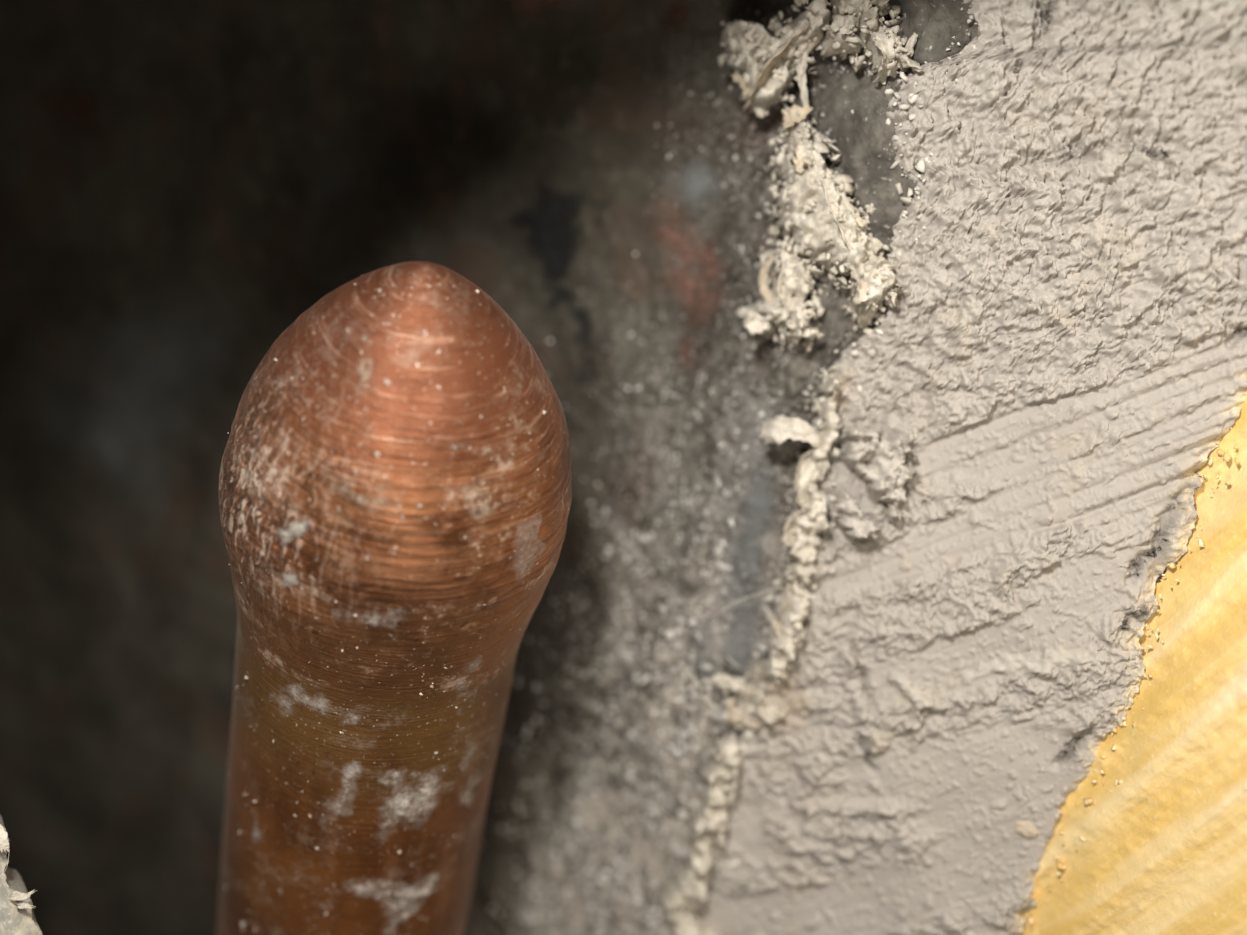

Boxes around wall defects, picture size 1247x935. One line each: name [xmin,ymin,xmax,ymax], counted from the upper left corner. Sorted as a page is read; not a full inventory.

flaking render [721,0,977,684]
peeling [1014,820,1039,839]